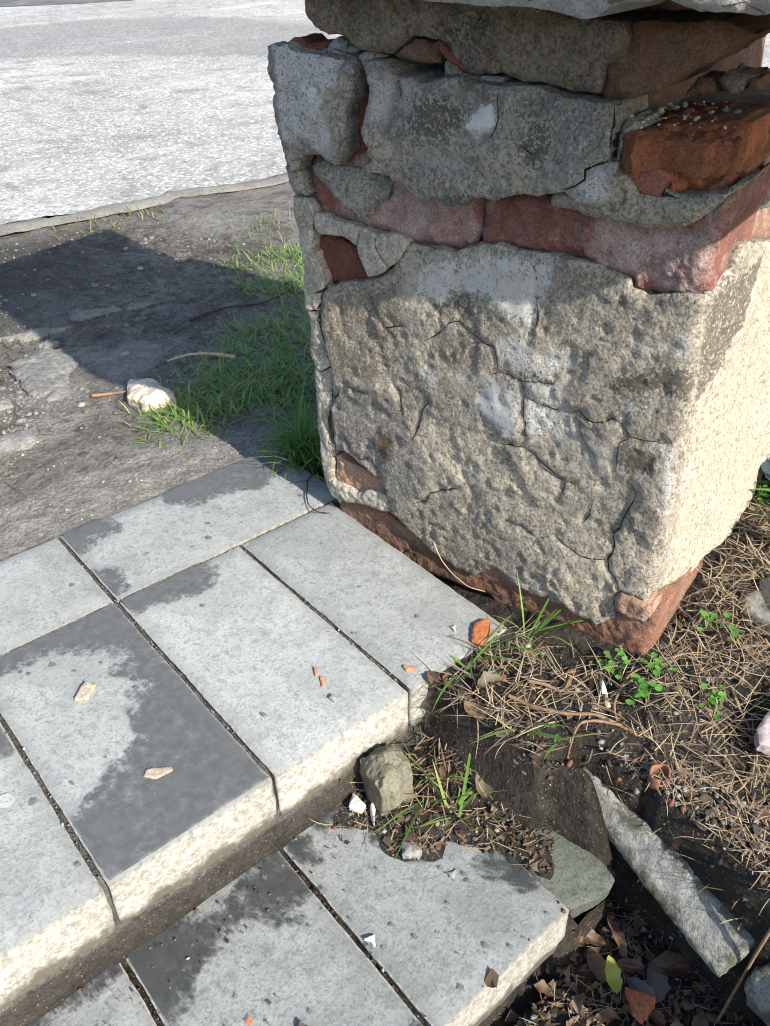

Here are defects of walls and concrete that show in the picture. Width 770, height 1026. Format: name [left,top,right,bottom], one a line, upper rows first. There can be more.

crack [310,278,381,478]
peeling [293,193,414,512]
crack [373,288,664,588]